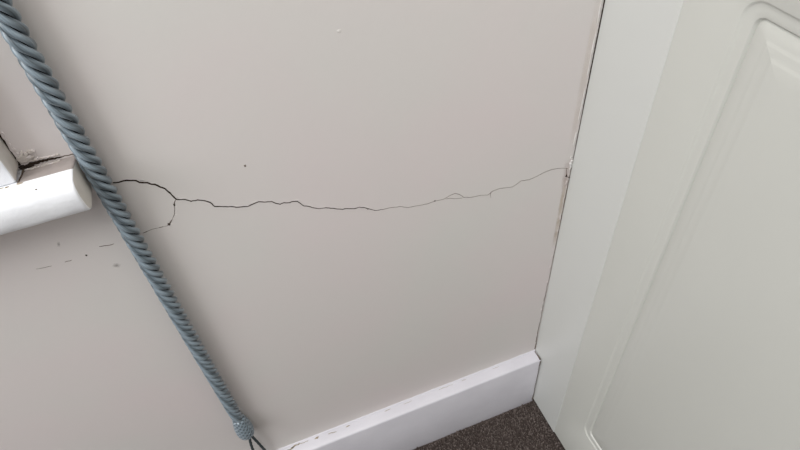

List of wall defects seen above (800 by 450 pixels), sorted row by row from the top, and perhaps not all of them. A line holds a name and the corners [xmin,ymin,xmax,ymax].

crack [0,132,74,183]
crack [113,0,605,399]